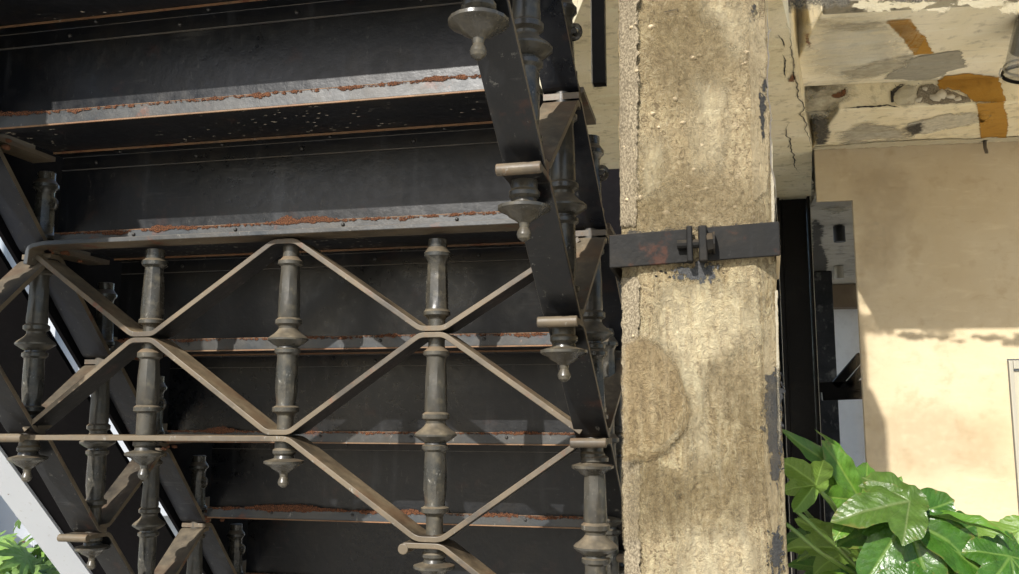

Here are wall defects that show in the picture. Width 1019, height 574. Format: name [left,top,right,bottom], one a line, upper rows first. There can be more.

peeling [852,0,1019,14]
peeling [750,78,775,222]
crack [766,9,811,219]
peeling [813,83,1019,150]
peeling [760,290,786,490]
peeling [766,525,786,574]